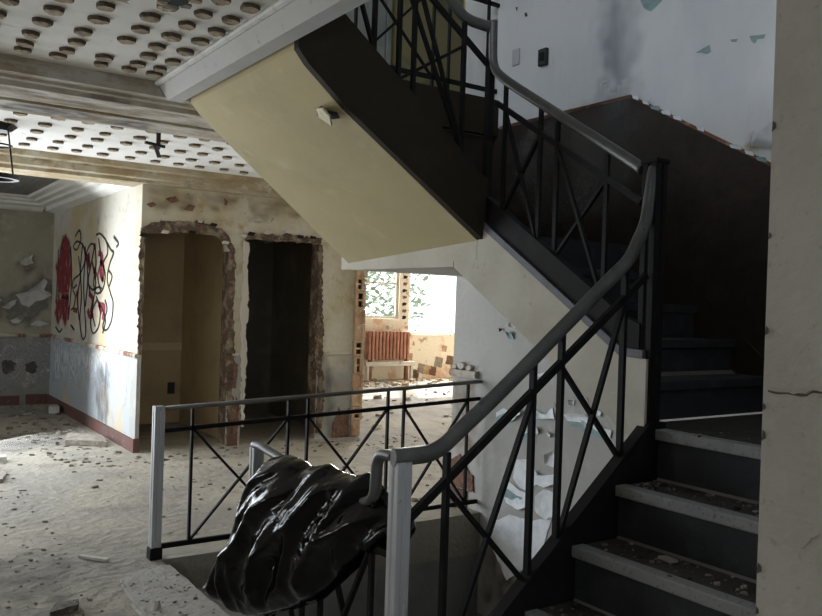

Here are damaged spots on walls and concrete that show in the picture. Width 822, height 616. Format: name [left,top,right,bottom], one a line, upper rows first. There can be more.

peeling [640,0,662,12]
peeling [0,275,52,327]
flaking render [136,196,366,446]
crack [767,387,822,398]
peeling [523,397,611,443]
peeling [491,451,554,580]